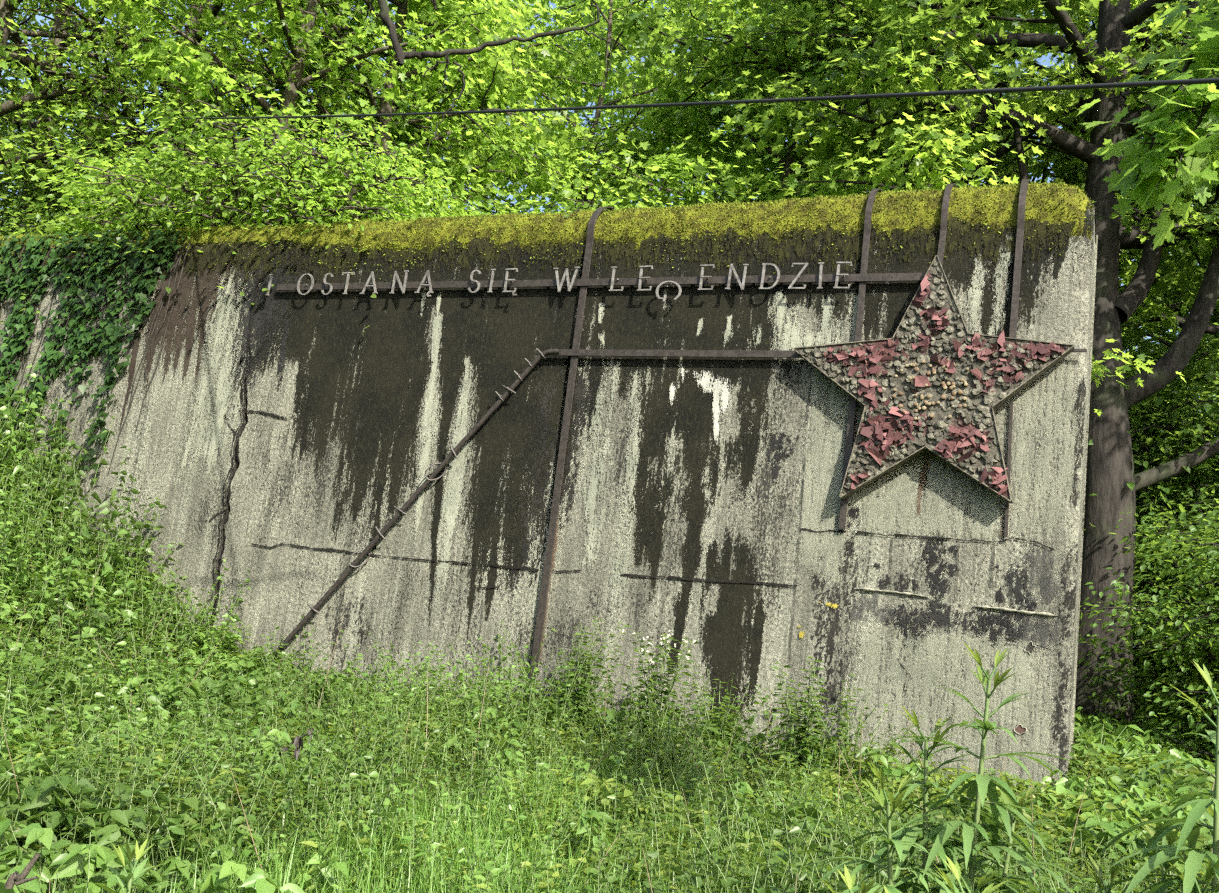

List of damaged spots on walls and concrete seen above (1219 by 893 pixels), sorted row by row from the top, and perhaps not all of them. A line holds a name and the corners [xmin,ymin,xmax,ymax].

leakage [120,243,302,490]
crack [209,247,581,652]
leakage [351,289,666,646]
leakage [669,367,732,444]
leakage [724,315,733,347]
leakage [741,425,799,498]
leakage [752,290,880,361]
leakage [963,234,1013,337]
leakage [1052,233,1069,287]
leakage [666,474,718,684]
leakage [710,598,767,733]
leakage [803,534,861,714]